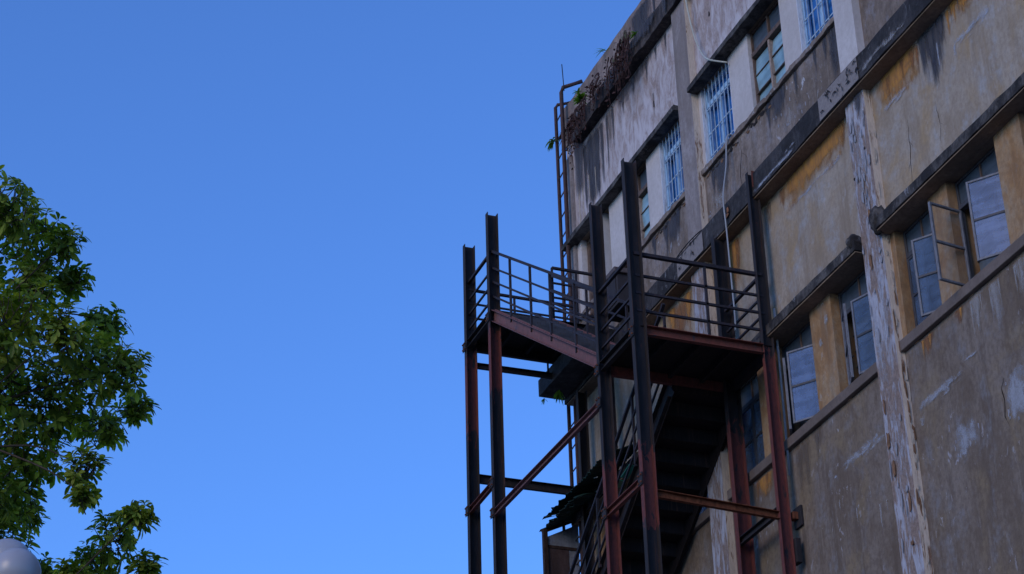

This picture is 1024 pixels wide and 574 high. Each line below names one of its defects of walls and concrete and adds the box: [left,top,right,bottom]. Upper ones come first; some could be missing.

damp [626,0,665,60]
damp [918,10,987,78]
damp [573,34,666,204]
peeling [707,57,859,178]
rust [669,292,691,331]
peeling [899,344,918,469]
peeling [1001,376,1024,426]
peeling [886,433,924,519]